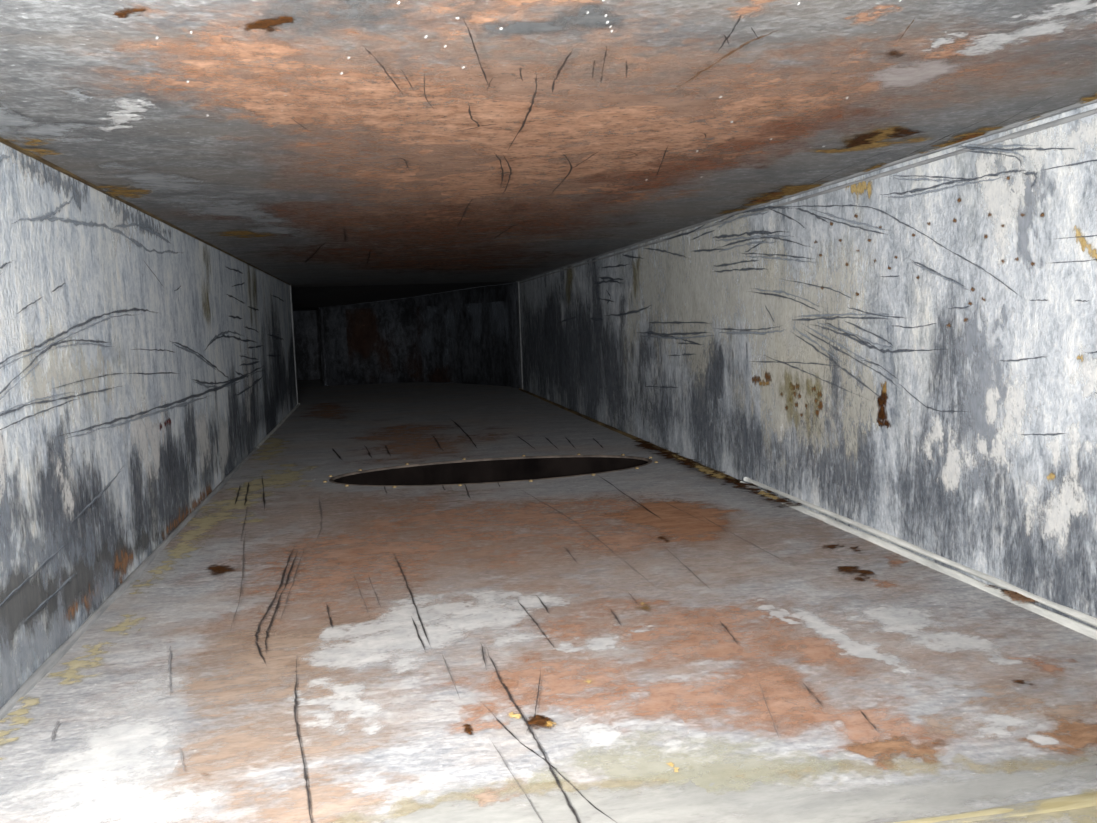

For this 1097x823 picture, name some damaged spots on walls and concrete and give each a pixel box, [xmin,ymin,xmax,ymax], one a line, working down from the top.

corrosion [121,15,1063,301]
leakage [0,294,317,744]
leakage [292,590,578,735]
corrosion [164,496,740,823]
leakage [418,258,878,527]
corrosion [448,599,963,770]
corrosion [877,382,891,428]
leakage [757,599,1021,673]
leakage [894,305,1097,629]
corrosion [985,585,1038,603]
leakage [973,715,1058,745]
corrosion [968,656,1097,759]